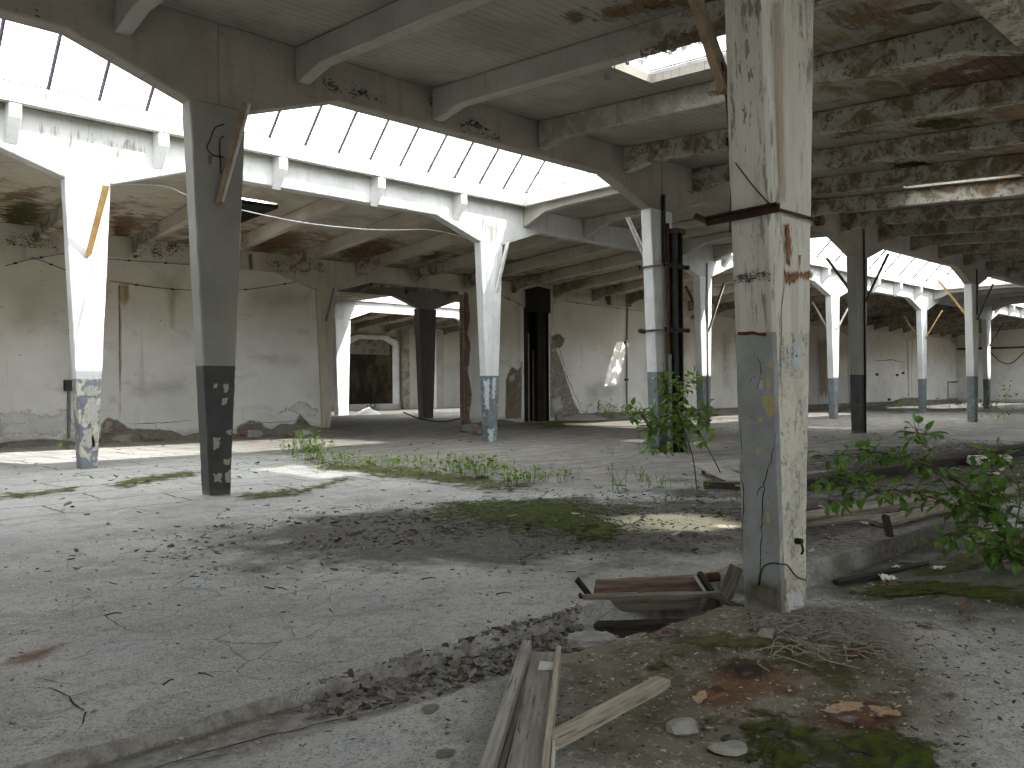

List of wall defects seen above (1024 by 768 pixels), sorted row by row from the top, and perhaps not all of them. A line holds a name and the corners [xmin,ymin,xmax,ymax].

corrosion [784,224,814,285]
flaking render [459,292,522,425]
flaking render [549,333,580,419]
crack [740,220,789,593]
peeling [213,420,265,483]